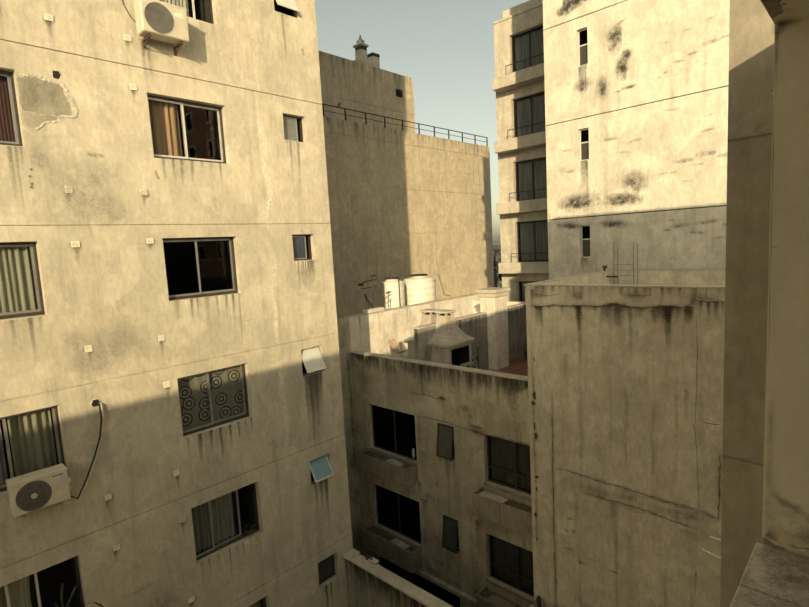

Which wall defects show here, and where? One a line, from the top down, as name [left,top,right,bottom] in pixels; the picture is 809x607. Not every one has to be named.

peeling [760,0,791,19]
spalling [16,69,78,130]
water stain [654,301,718,321]
water stain [405,362,486,382]
water stain [501,377,528,388]